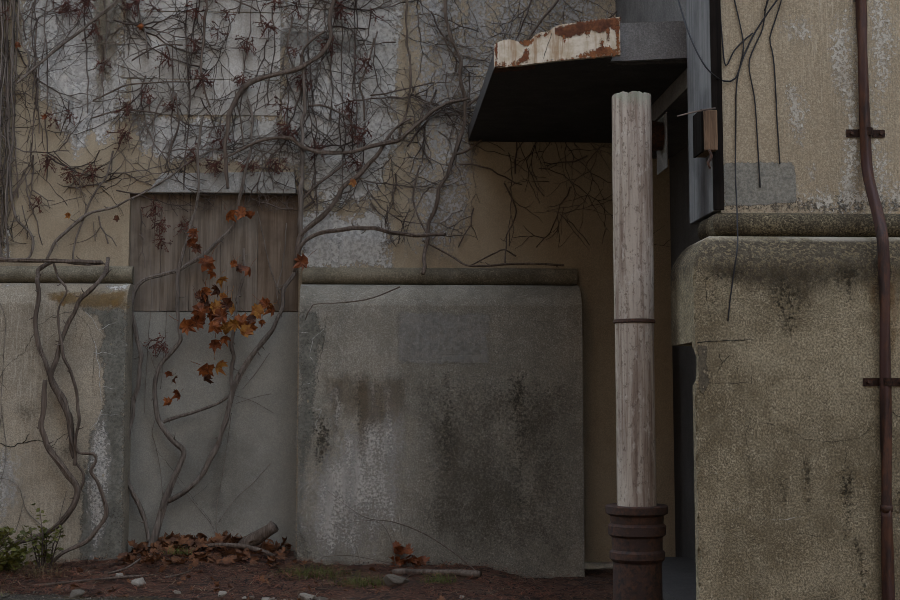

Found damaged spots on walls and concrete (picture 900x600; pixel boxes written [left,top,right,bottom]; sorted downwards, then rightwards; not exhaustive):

corrosion [494,17,621,69]
damp [730,196,868,212]
crack [0,434,65,450]
damp [301,380,404,556]